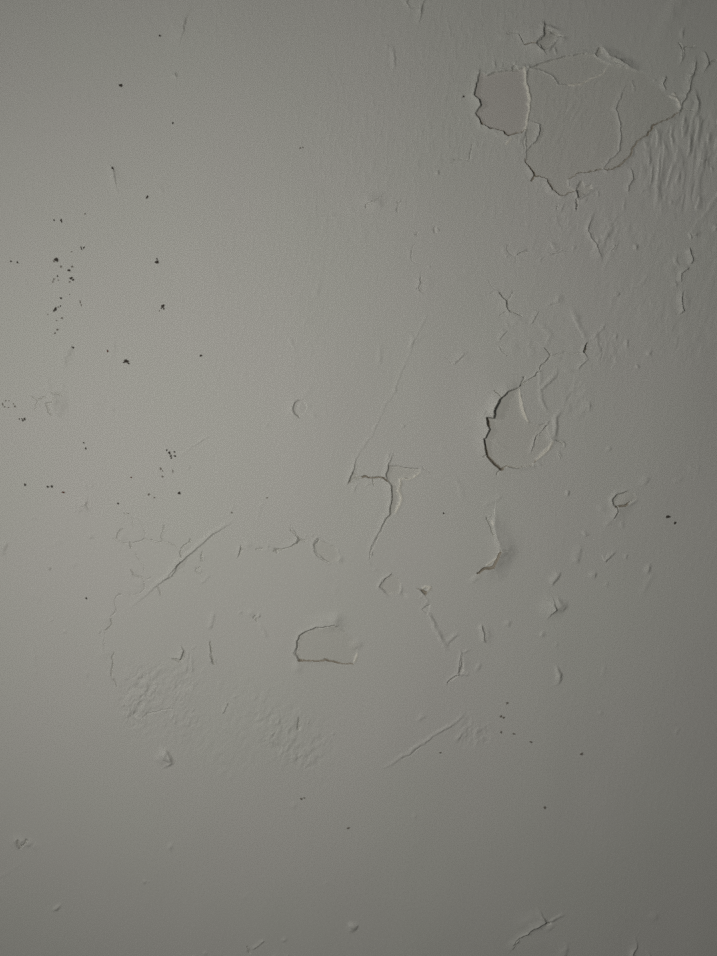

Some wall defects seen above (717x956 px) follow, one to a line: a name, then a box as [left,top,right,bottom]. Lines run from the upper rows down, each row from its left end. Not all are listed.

crack [150,535,213,596]
crack [236,525,314,558]
crack [471,505,524,584]